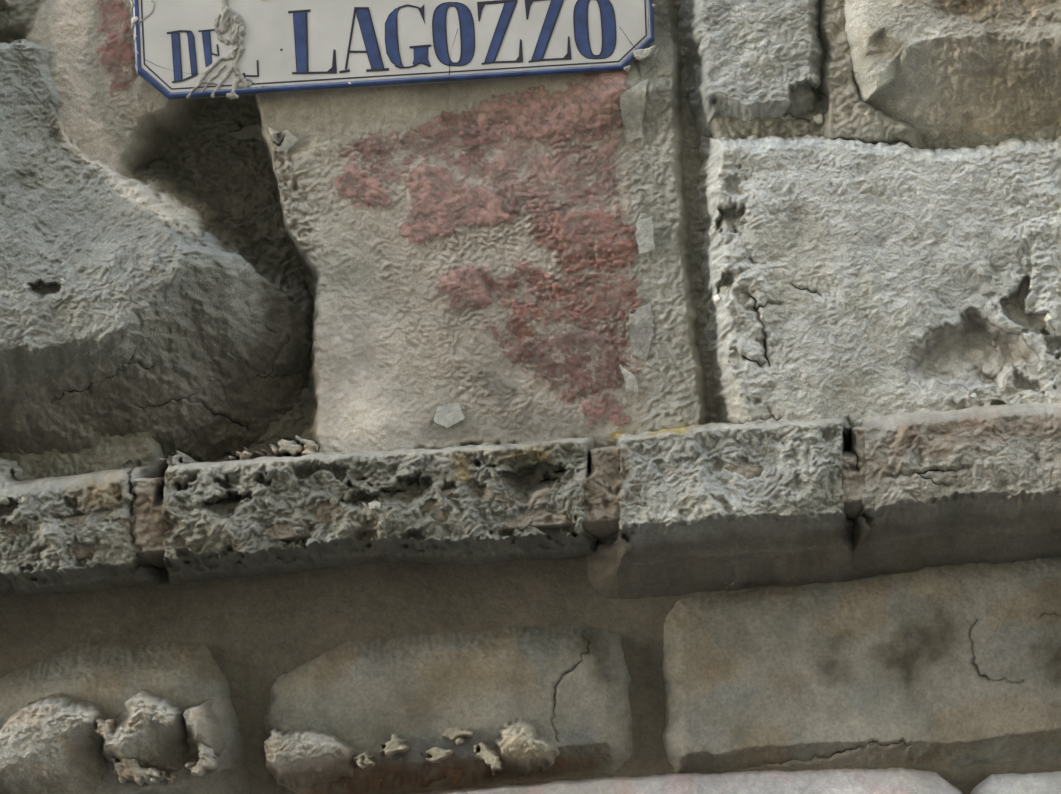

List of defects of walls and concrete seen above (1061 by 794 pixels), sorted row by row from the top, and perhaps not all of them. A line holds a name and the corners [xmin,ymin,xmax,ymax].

peeling [335,46,661,428]